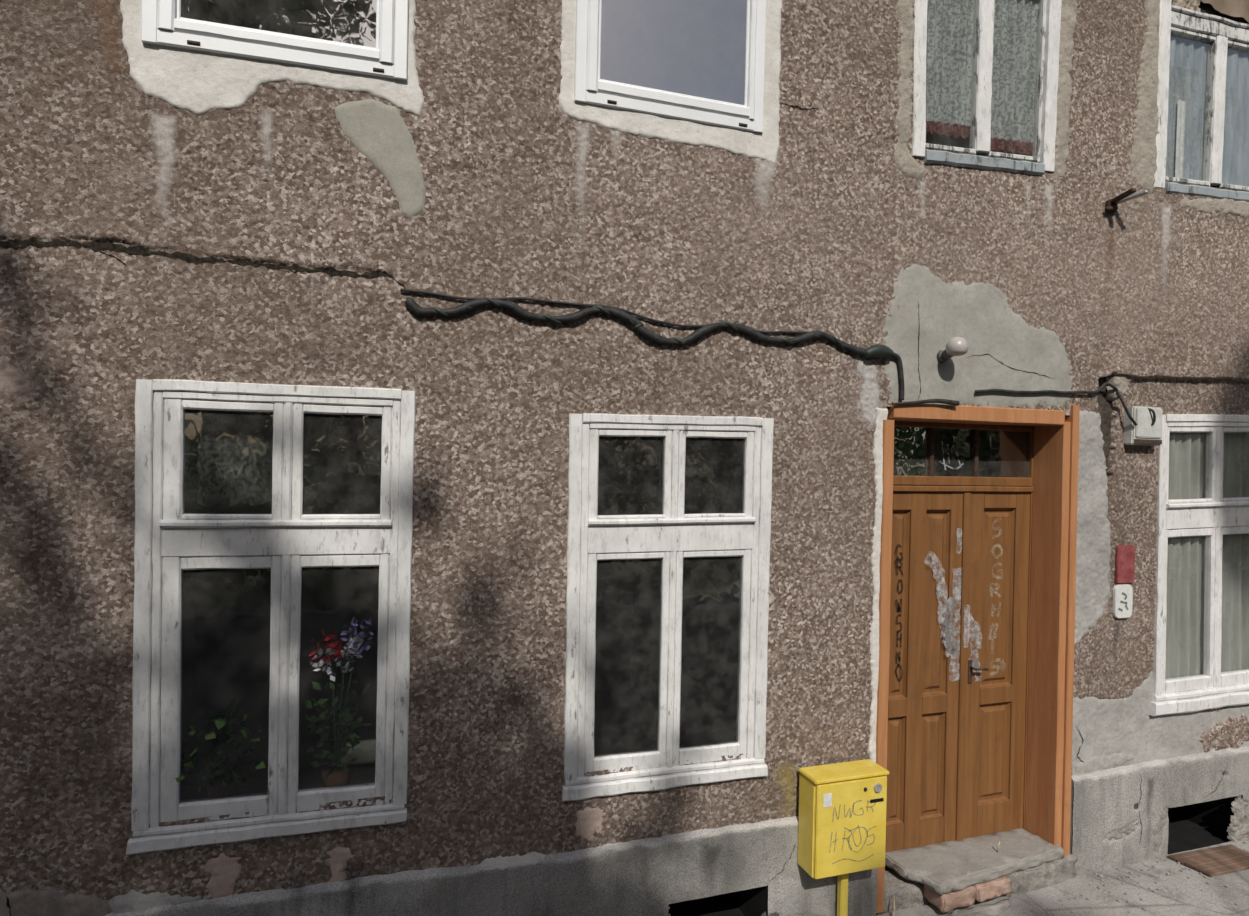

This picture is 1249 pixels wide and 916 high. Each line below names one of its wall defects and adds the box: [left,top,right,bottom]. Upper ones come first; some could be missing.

crack [0,237,406,289]
flaking render [1072,671,1249,776]
spalling [1105,804,1139,841]
spalling [1153,807,1167,852]
spalling [1227,795,1249,843]